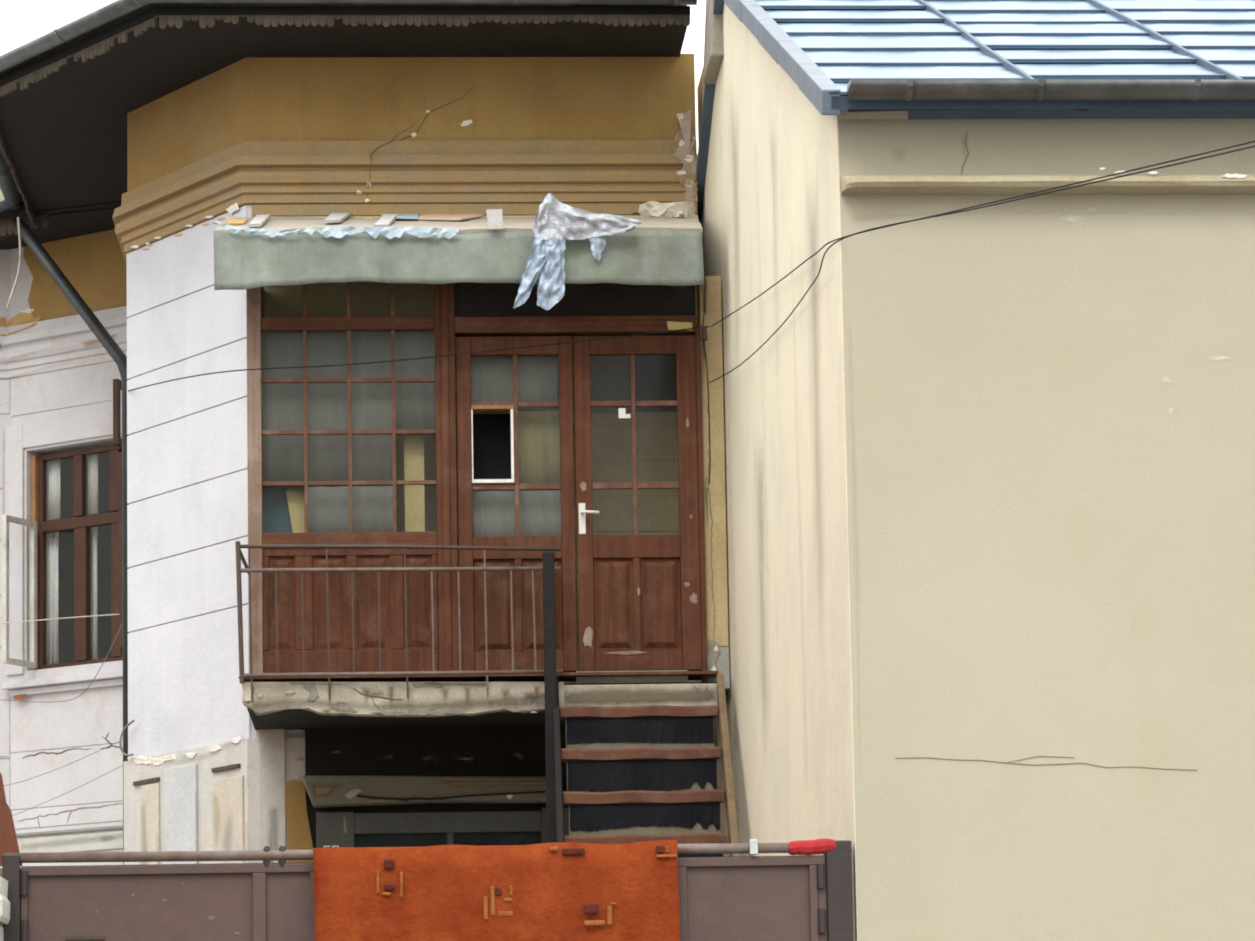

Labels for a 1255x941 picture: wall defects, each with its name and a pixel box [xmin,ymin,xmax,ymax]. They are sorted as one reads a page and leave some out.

spalling [673,110,698,215]
flaking render [0,203,239,336]
spalling [253,682,357,714]
spalling [372,707,475,716]
spalling [501,704,545,713]
peeling [127,737,242,766]
crack [912,756,1188,770]